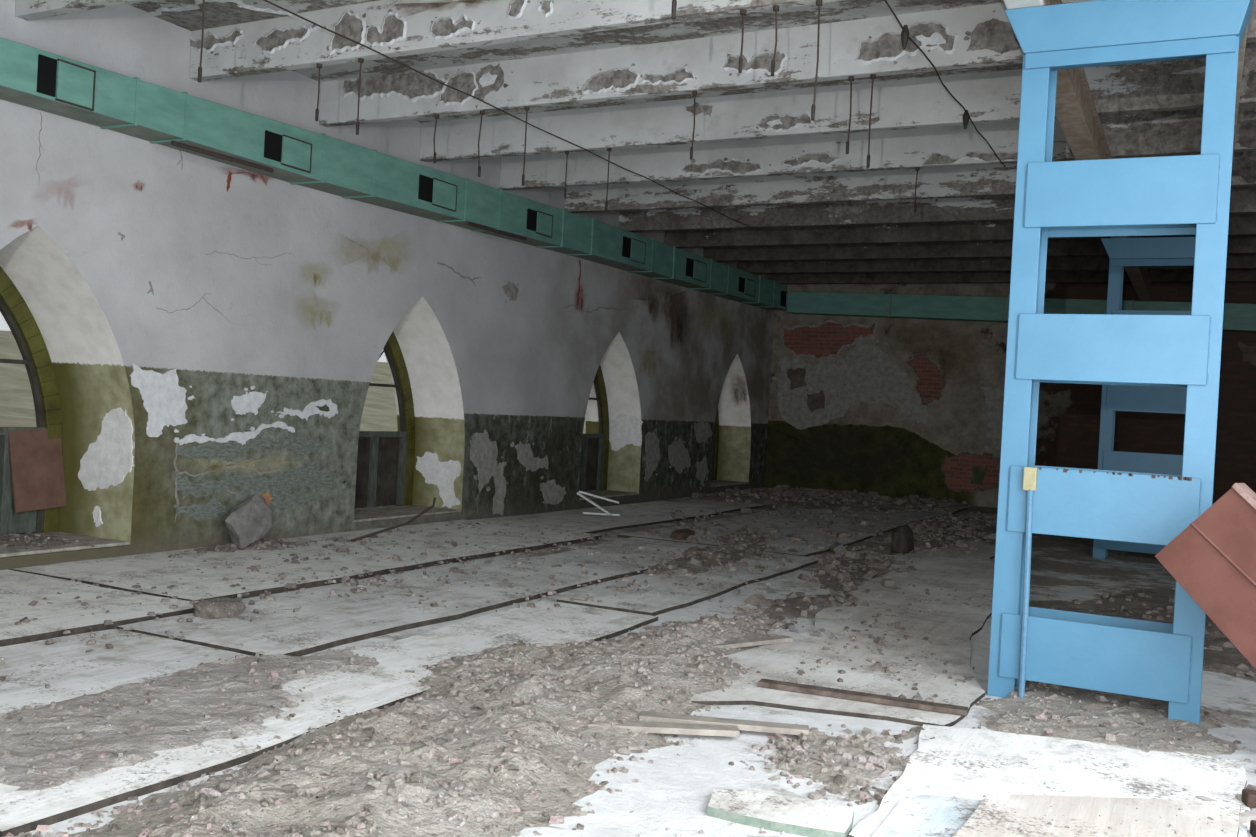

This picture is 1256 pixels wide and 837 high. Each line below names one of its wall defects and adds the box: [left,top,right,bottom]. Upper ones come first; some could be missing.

spalling [507,0,554,19]
spalling [140,0,407,59]
spalling [430,13,481,40]
spalling [723,49,788,76]
spalling [342,63,513,108]
spalling [577,63,697,95]
spalling [755,111,815,132]
spalling [681,150,842,176]
peeling [772,319,877,430]
peeling [78,364,338,491]
spalling [940,381,1004,492]
peeling [92,506,104,527]